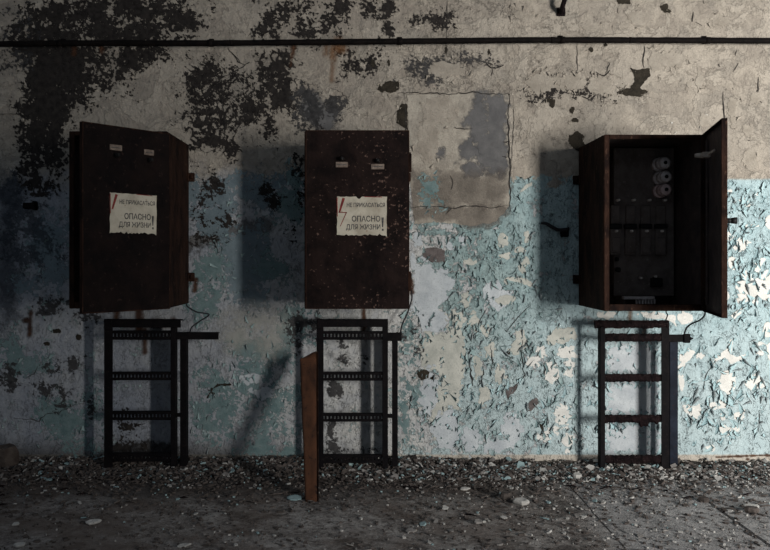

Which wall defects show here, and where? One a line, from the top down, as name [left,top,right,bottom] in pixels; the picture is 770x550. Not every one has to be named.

peeling [422,46,471,85]
flaking render [377,81,400,97]
peeling [521,66,651,108]
peeling [388,94,661,459]
corrosion [23,310,32,336]
peeling [636,311,693,333]
peeling [678,180,770,452]